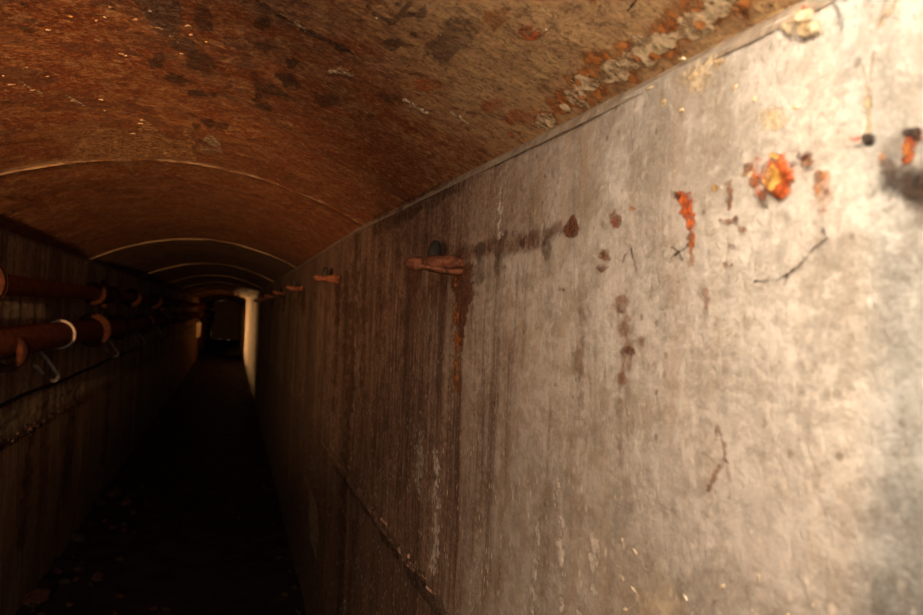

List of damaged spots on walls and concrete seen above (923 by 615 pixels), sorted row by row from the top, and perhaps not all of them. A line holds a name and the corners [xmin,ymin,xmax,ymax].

peeling [534,0,751,131]
rust [743,162,758,187]
damp [881,159,923,204]
rust [901,127,923,165]
rust [674,191,695,264]
rust [451,262,474,392]
efflorescence [415,446,441,575]